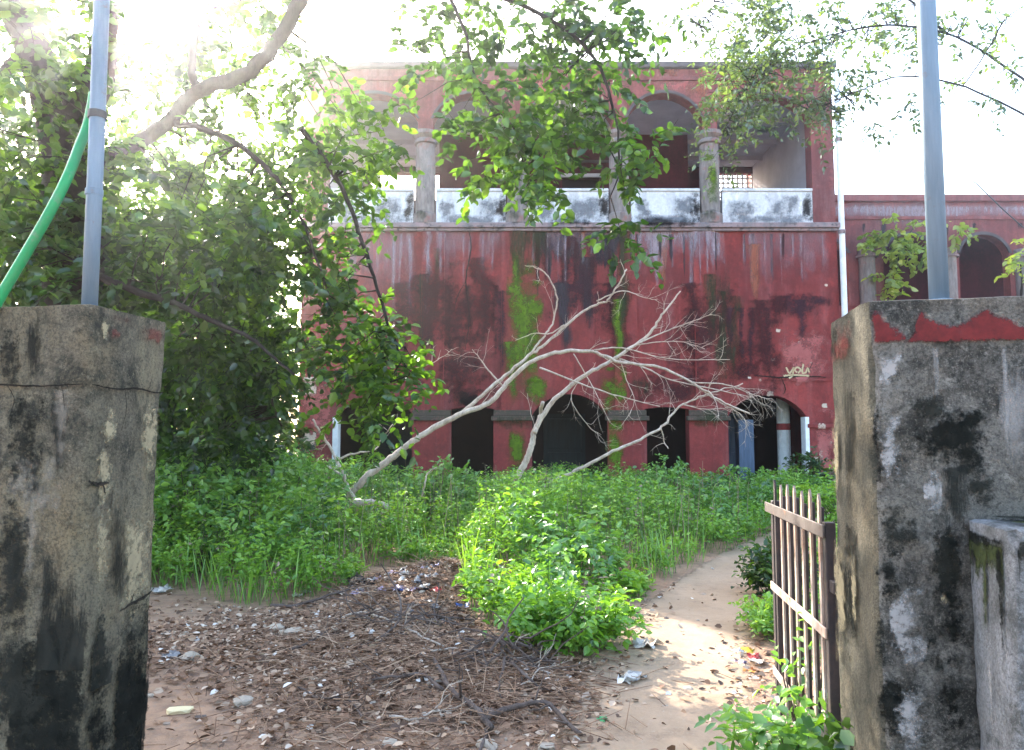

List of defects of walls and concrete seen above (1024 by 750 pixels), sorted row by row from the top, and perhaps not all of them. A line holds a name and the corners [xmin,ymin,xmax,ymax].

leakage [437,196,506,246]
leakage [0,319,41,384]
crack [0,376,163,431]
leakage [386,234,506,405]
leakage [533,194,830,401]
leakage [842,389,854,496]
peeling [872,309,1024,343]
leakage [0,391,152,750]
leakage [844,525,856,638]
leakage [872,405,920,664]
leakage [911,395,994,731]
leakage [878,679,901,737]